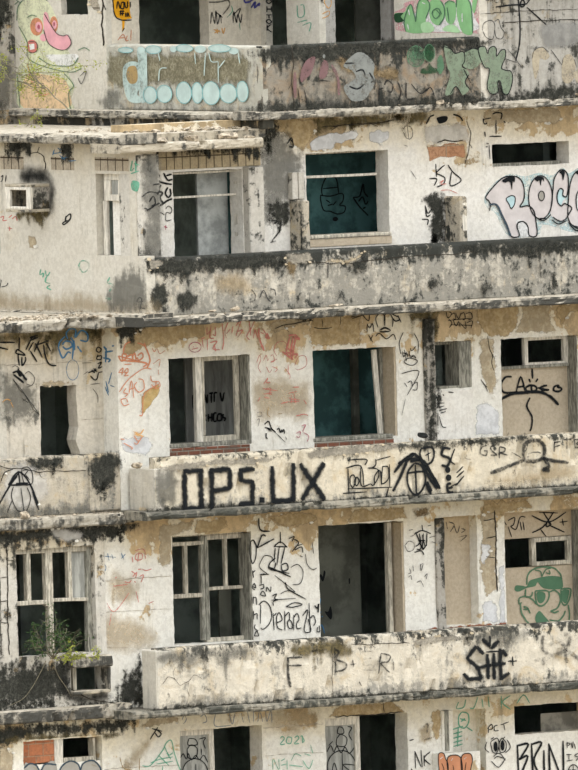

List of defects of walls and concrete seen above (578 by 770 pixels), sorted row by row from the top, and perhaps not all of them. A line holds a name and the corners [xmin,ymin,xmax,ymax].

leakage [247,38,492,74]
peeling [274,119,317,151]
peeling [425,124,468,161]
peeling [484,108,563,126]
leakage [107,251,296,312]
peeling [477,304,578,398]
leakage [88,451,125,501]
peeling [269,512,316,529]
peeling [158,517,227,567]
leakage [291,640,352,669]
leakage [0,656,575,711]
leakage [0,719,136,747]